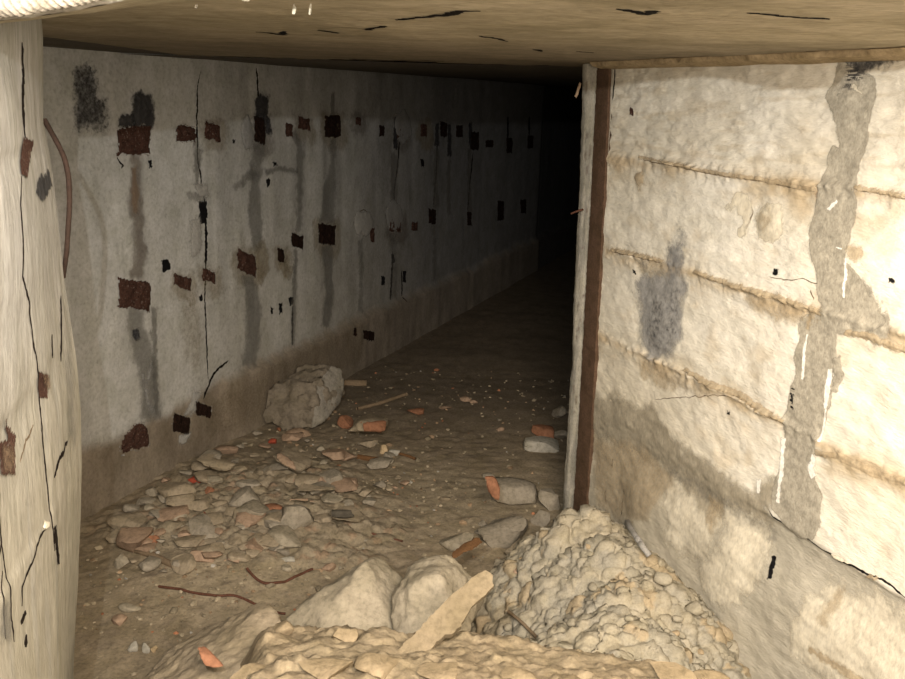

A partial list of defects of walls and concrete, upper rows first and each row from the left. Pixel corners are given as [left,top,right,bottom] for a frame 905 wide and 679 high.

crack [365,11,481,30]
crack [20,42,28,138]
crack [196,72,228,399]
crack [0,176,68,647]
rust [38,371,50,399]
rust [0,419,16,476]
crack [807,538,905,598]